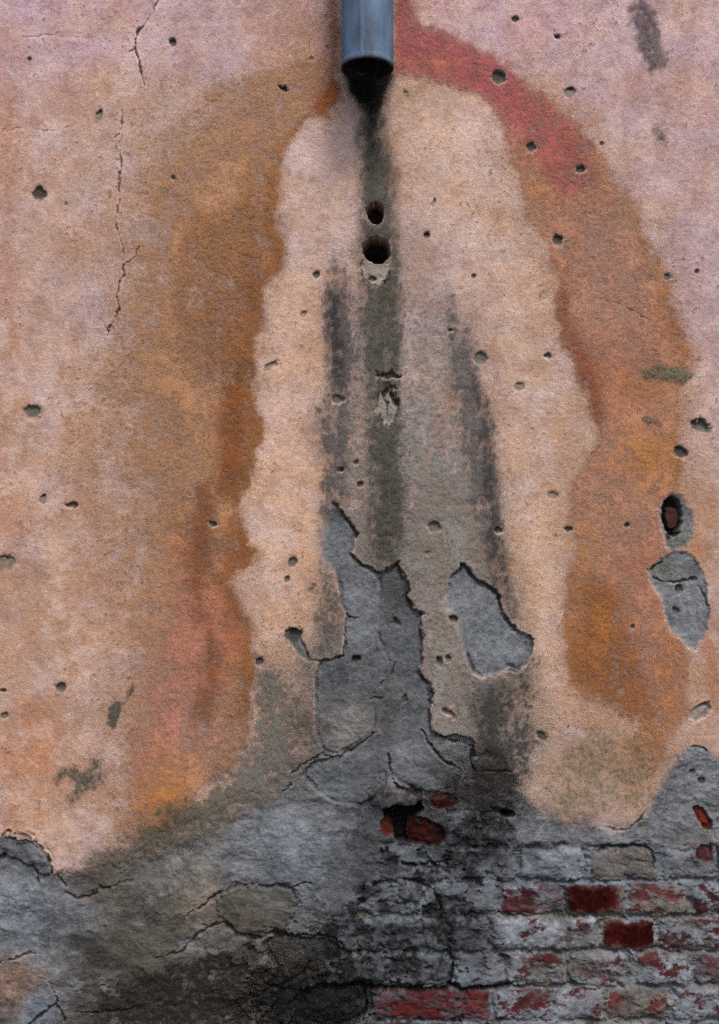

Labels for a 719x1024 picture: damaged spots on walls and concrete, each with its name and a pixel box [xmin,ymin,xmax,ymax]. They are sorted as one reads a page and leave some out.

crack [124,0,160,88]
crack [106,107,142,340]
hole [38,492,83,510]
hole [0,552,22,575]
damp [93,72,540,1024]
hole [0,711,11,722]
hole [51,679,69,697]
hole [252,654,267,671]
flaking render [259,486,719,1024]
crack [0,829,137,902]
crack [0,949,137,1024]
crack [154,881,515,1024]